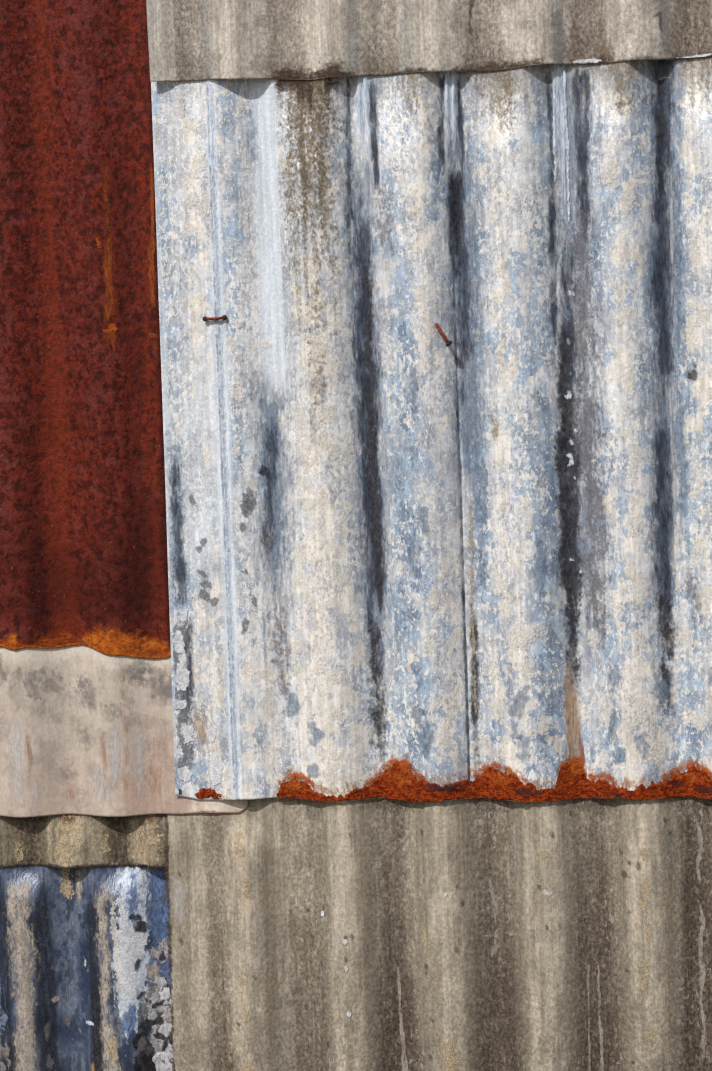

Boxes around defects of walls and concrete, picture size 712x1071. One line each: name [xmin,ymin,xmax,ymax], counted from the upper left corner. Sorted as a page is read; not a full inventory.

peeling [0,883,53,1071]
peeling [53,814,111,902]
corrosion [0,630,171,659]
corrosion [96,237,117,348]
peeling [86,821,182,1071]
water stain [162,445,195,770]
water stain [261,398,285,590]
water stain [278,78,392,756]
water stain [428,77,488,781]
corrosion [276,667,712,802]
water stain [545,14,639,683]
water stain [645,46,712,710]